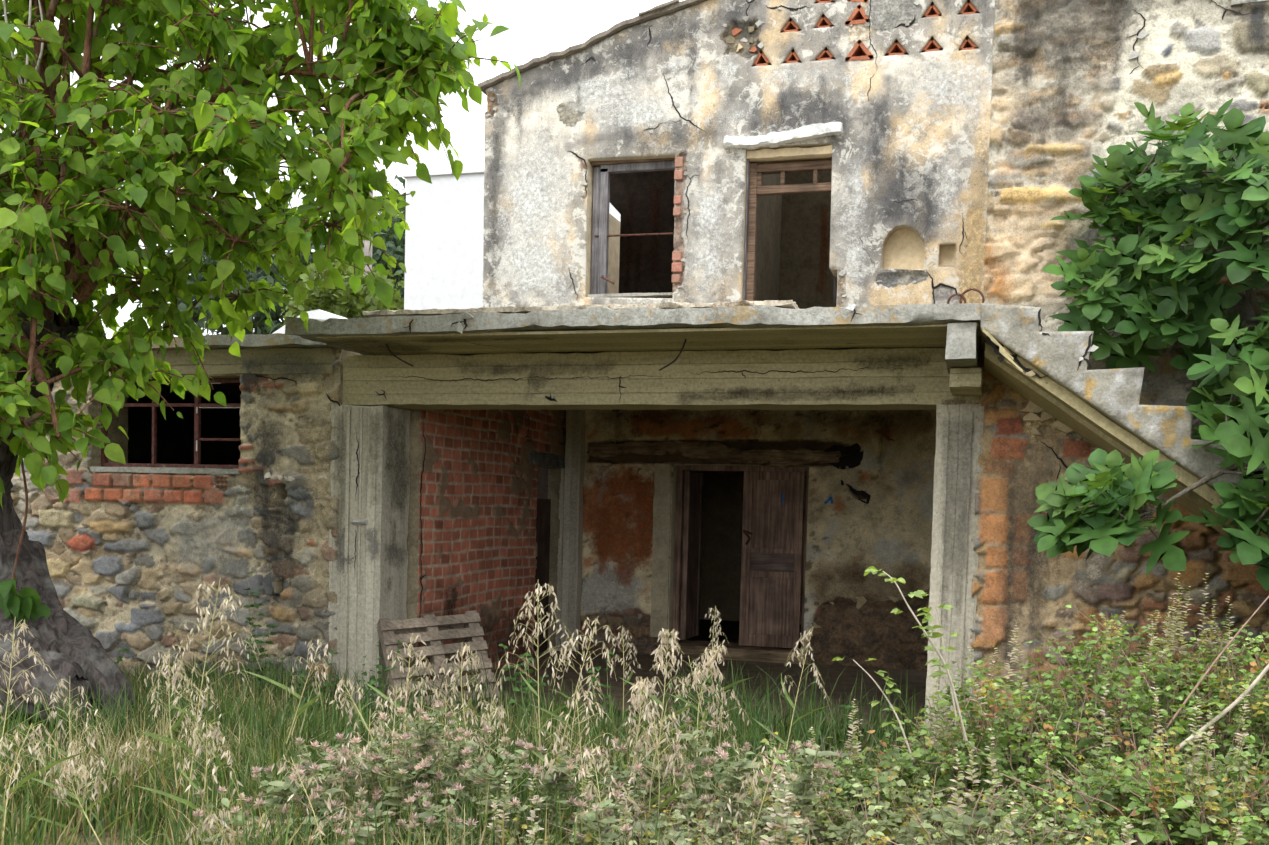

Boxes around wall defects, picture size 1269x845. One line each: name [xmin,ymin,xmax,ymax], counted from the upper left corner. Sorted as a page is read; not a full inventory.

crack [1211,0,1252,20]
crack [643,25,708,134]
flaking render [718,16,764,90]
leakage [1014,0,1123,135]
crack [451,312,474,334]
crack [247,373,298,390]
crack [373,367,903,442]
leakage [681,387,910,401]
crack [350,432,360,569]